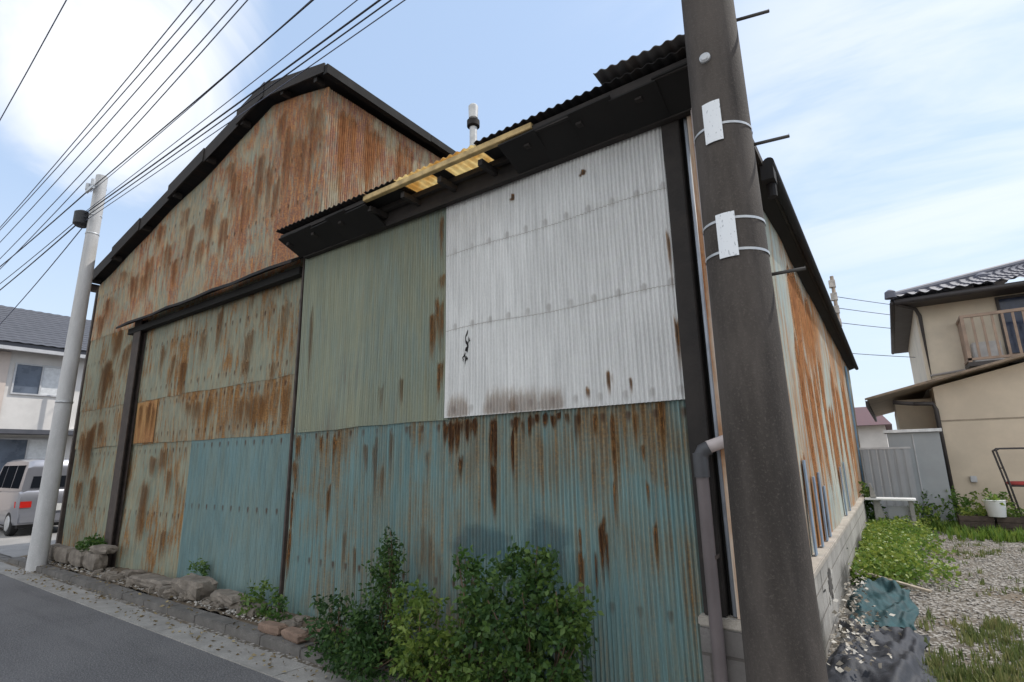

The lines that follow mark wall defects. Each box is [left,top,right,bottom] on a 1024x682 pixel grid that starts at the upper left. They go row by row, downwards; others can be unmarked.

rust [338,111,379,195]
rust [430,298,444,352]
rust [133,400,158,444]
rust [443,418,477,474]
rust [489,419,497,514]
rust [511,411,580,470]
rust [578,414,617,591]
rust [787,268,854,518]